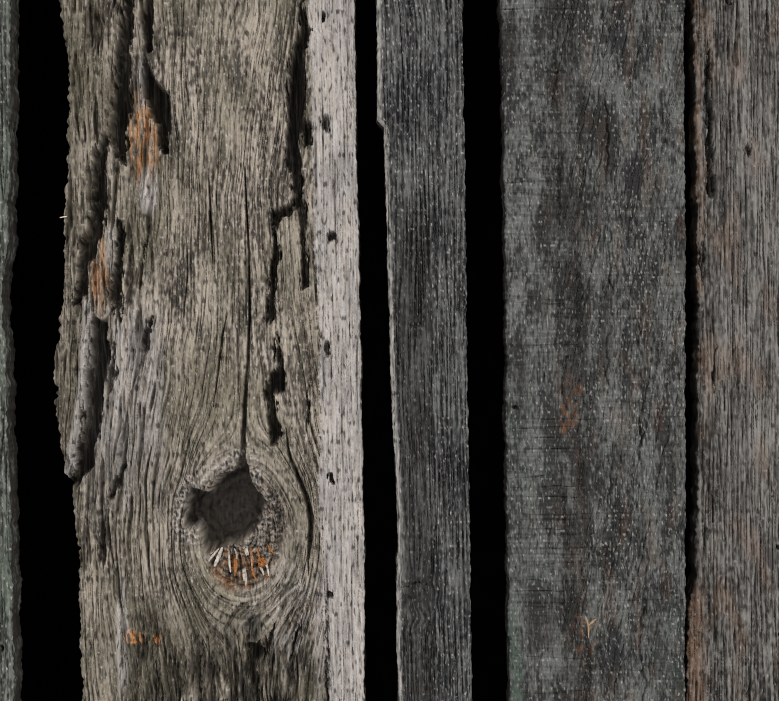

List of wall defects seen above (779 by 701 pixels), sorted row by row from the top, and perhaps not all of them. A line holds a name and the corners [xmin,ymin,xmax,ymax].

crack [71,0,172,490]
crack [182,222,190,320]
crack [207,168,215,265]
crack [237,0,315,577]
crack [213,311,228,408]
crack [107,455,130,502]
crack [97,526,108,576]
crack [151,639,164,701]
crack [198,639,206,701]
crack [243,621,277,701]
crack [289,619,305,661]
crack [324,595,332,701]